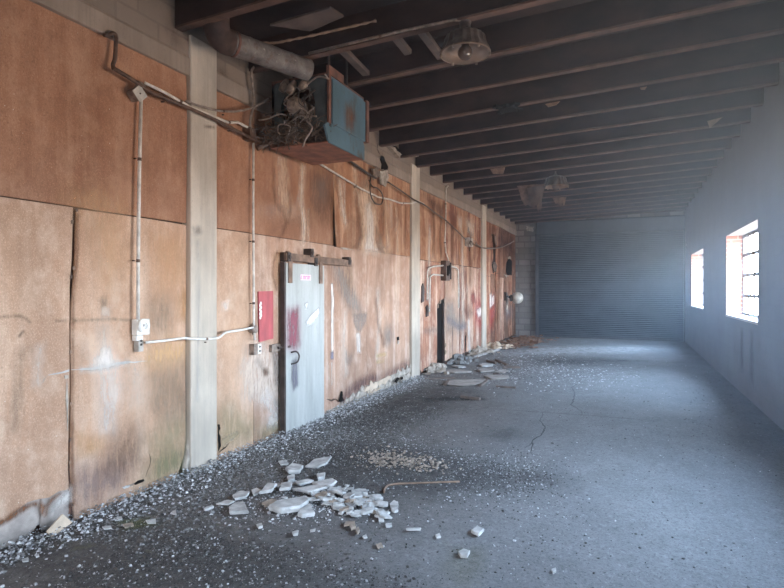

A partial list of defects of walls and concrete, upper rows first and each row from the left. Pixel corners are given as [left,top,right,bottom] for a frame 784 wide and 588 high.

leakage [355,182,398,252]
crack [490,380,653,457]